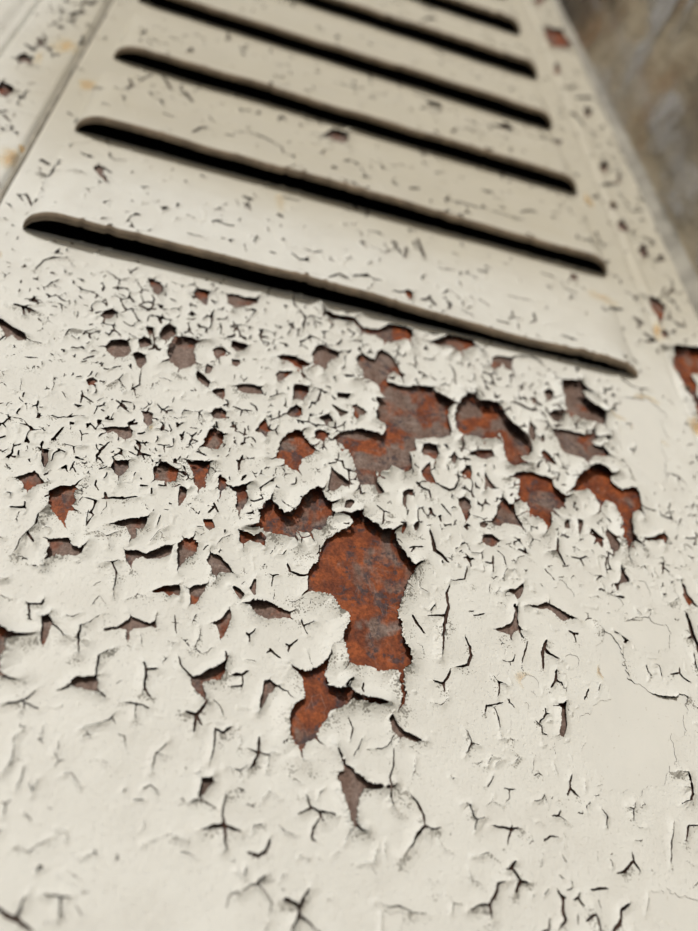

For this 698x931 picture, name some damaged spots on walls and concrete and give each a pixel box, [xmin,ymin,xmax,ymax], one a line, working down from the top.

peeling [0,312,37,351]
peeling [138,271,271,314]
crack [0,0,564,172]
peeling [308,122,360,152]
crack [253,0,698,439]
peeling [3,448,98,576]
crack [0,149,698,757]
peeling [88,287,698,852]
peeling [0,604,113,708]
crack [73,839,132,872]
crack [340,708,459,884]
crack [362,623,659,931]